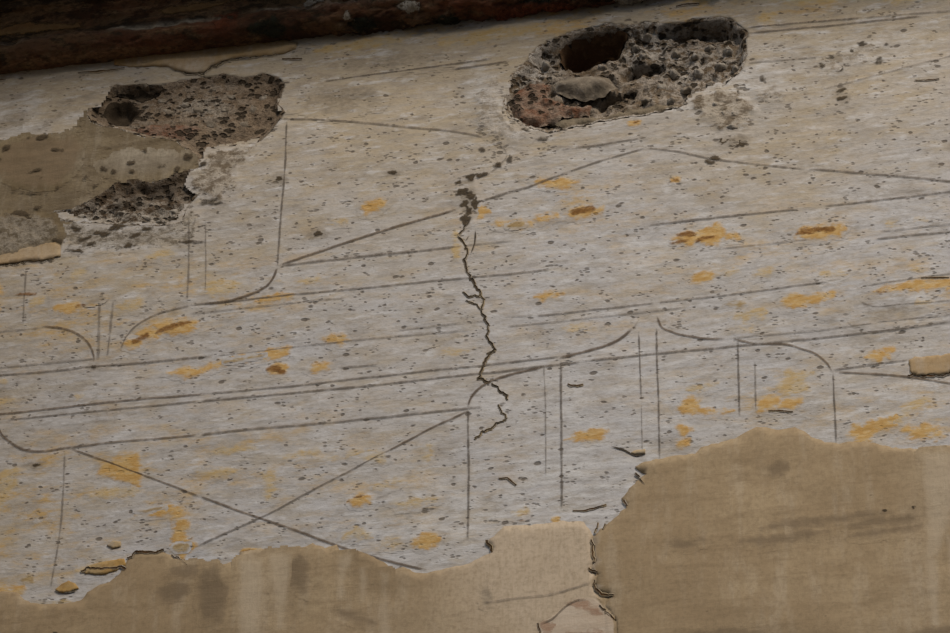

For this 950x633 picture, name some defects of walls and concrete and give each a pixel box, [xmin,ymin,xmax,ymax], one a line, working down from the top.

peeling [396,0,420,14]
flaking render [0,31,420,268]
flaking render [434,0,851,268]
crack [457,223,509,440]
flaking render [0,498,233,633]
peeling [92,447,146,487]
peeling [340,444,391,469]
crack [573,472,645,620]
flaking render [358,343,950,633]